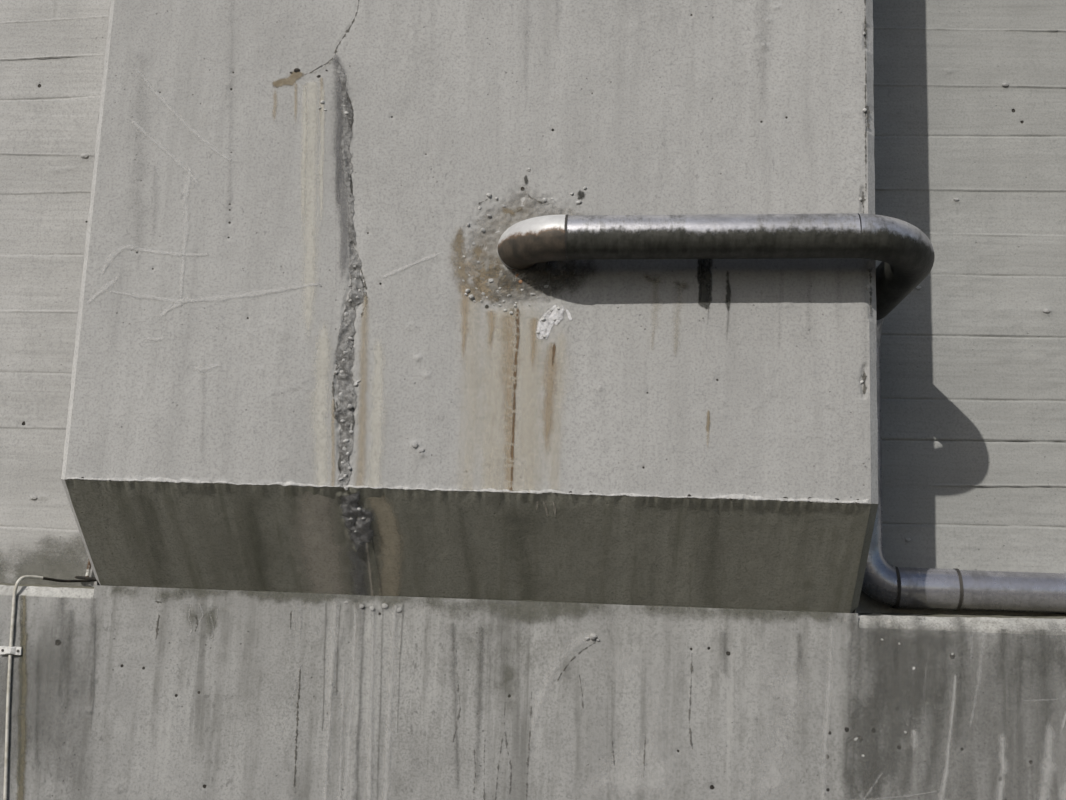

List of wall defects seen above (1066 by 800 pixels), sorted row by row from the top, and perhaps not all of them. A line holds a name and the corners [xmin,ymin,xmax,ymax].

crack [307,0,367,490]
spalling [454,168,594,315]
leakage [697,259,712,309]
corrosion [489,309,536,491]
corrosion [545,344,555,440]
leakage [0,539,87,800]
leakage [940,677,956,800]
leakage [1041,714,1066,800]